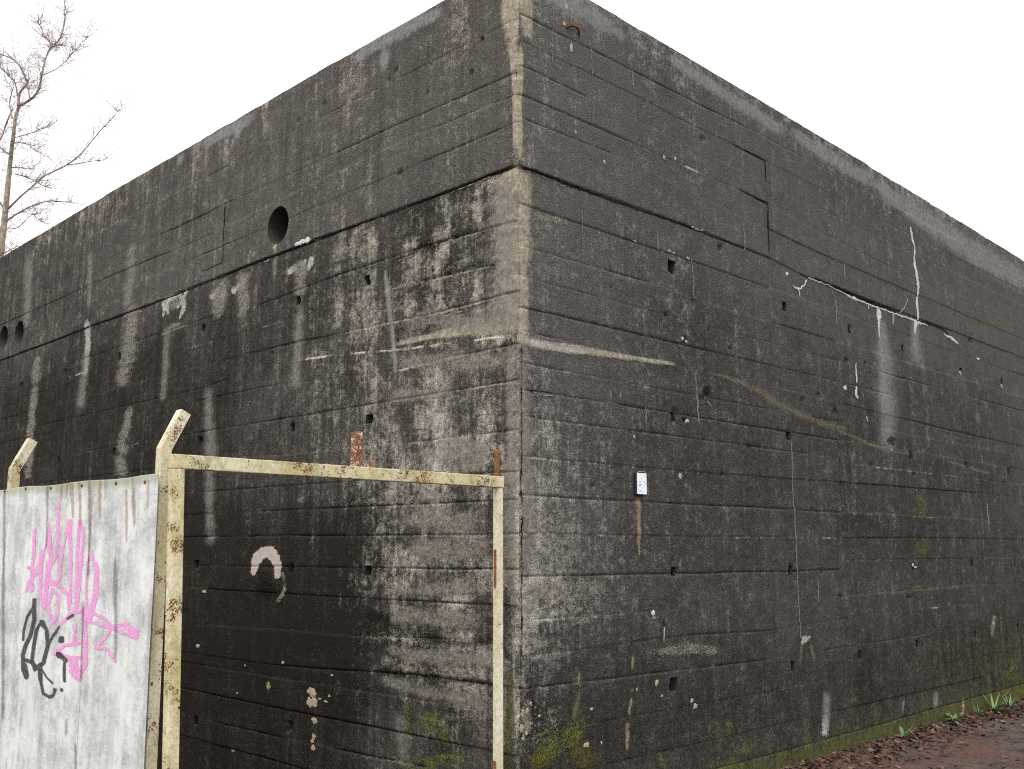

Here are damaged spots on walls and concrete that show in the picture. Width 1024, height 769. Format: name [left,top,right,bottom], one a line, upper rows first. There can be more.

water stain [76,319,91,404]
water stain [117,246,138,386]
water stain [161,289,187,395]
water stain [210,272,249,318]
water stain [274,249,314,296]
water stain [294,312,303,387]
crack [793,227,958,344]
water stain [24,355,40,479]
water stain [116,409,132,477]